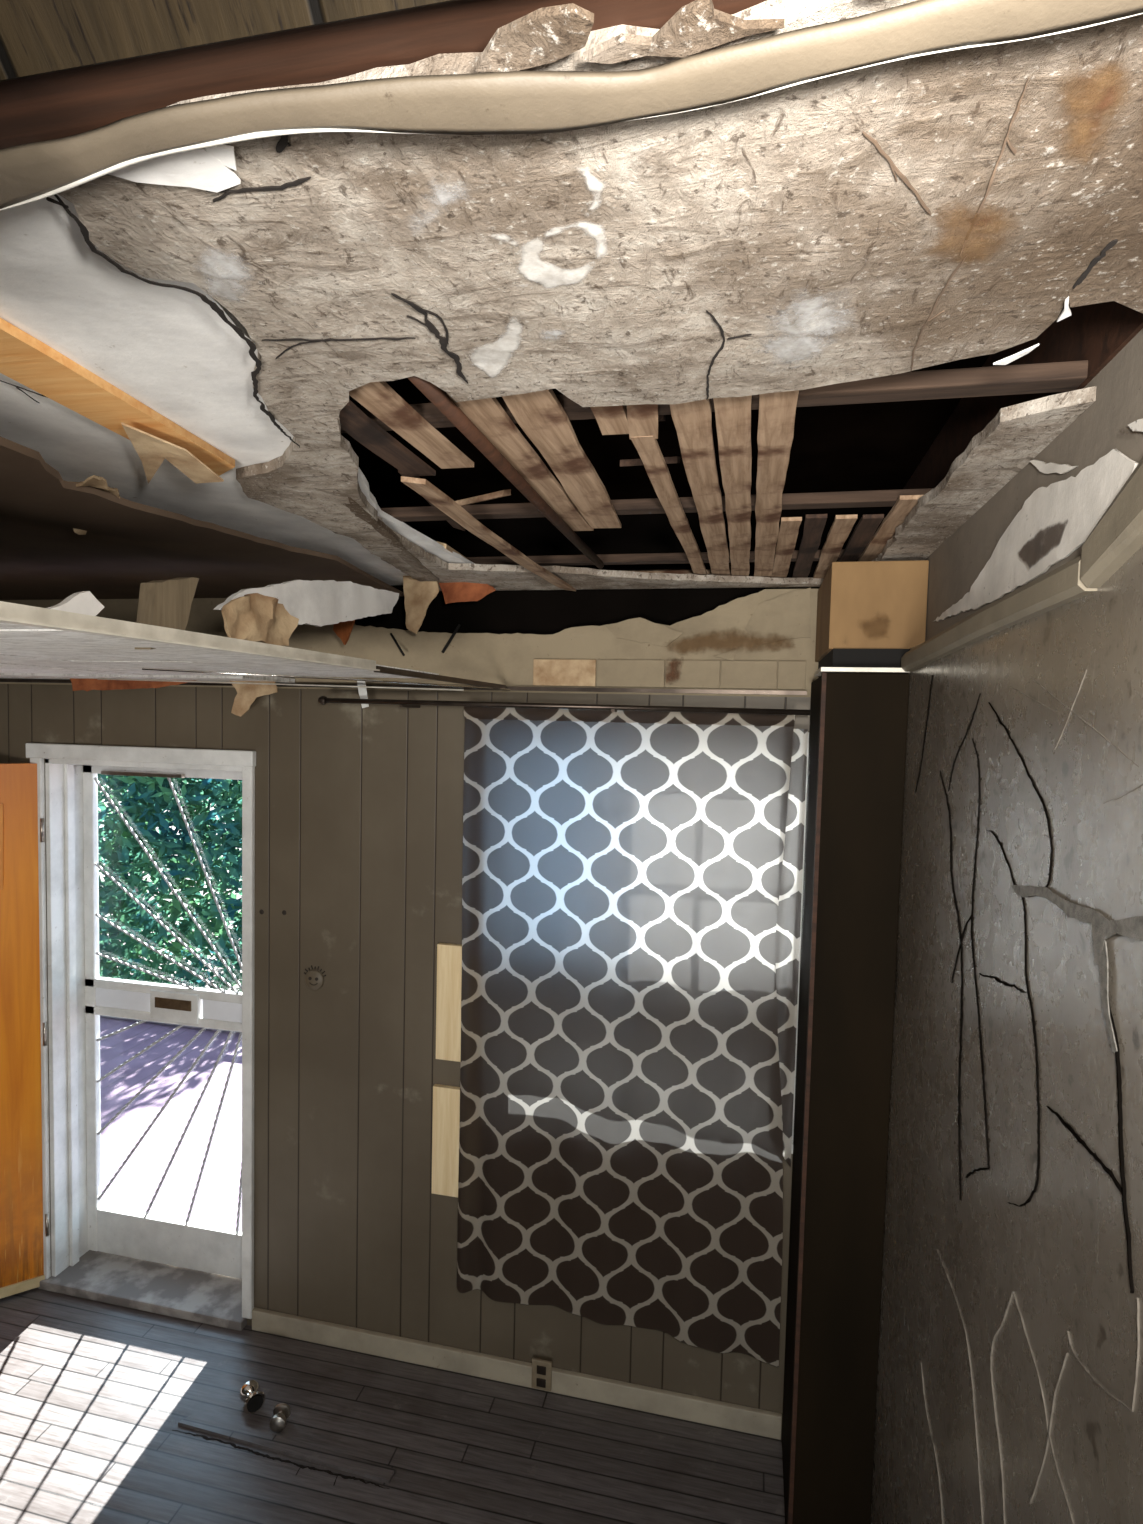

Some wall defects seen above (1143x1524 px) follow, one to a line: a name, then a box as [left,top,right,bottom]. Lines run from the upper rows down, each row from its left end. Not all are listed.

water stain [933,209,1004,261]
crack [46,194,468,448]
peeling [1057,296,1071,322]
peeling [993,344,1039,365]
peeling [1128,419,1143,432]
peeling [932,449,1138,622]
peeling [605,618,683,647]
crack [915,675,1134,1293]